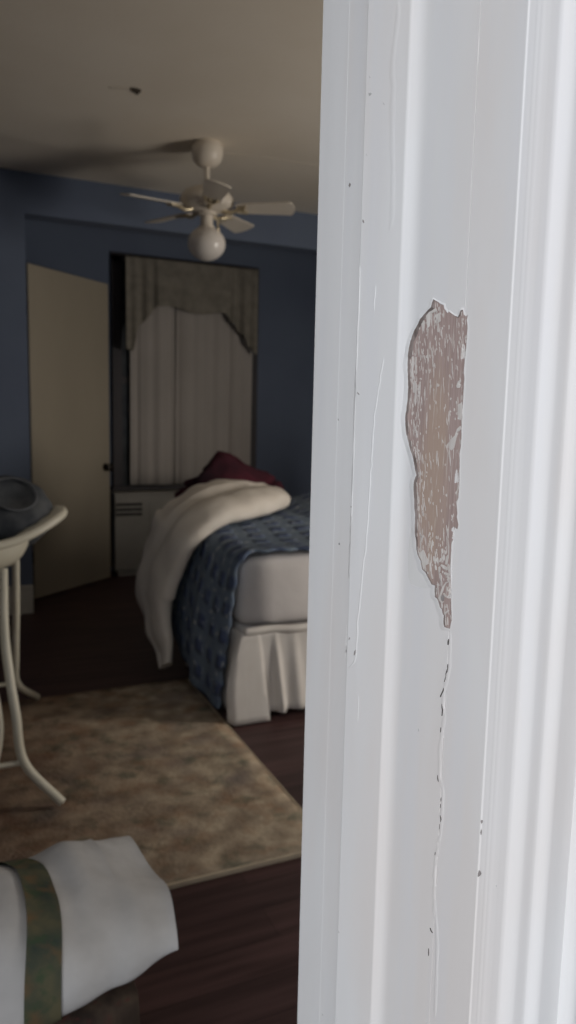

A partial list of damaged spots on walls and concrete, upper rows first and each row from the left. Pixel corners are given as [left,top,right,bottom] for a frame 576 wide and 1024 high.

peeling [401,297,470,631]
crack [428,630,452,1017]